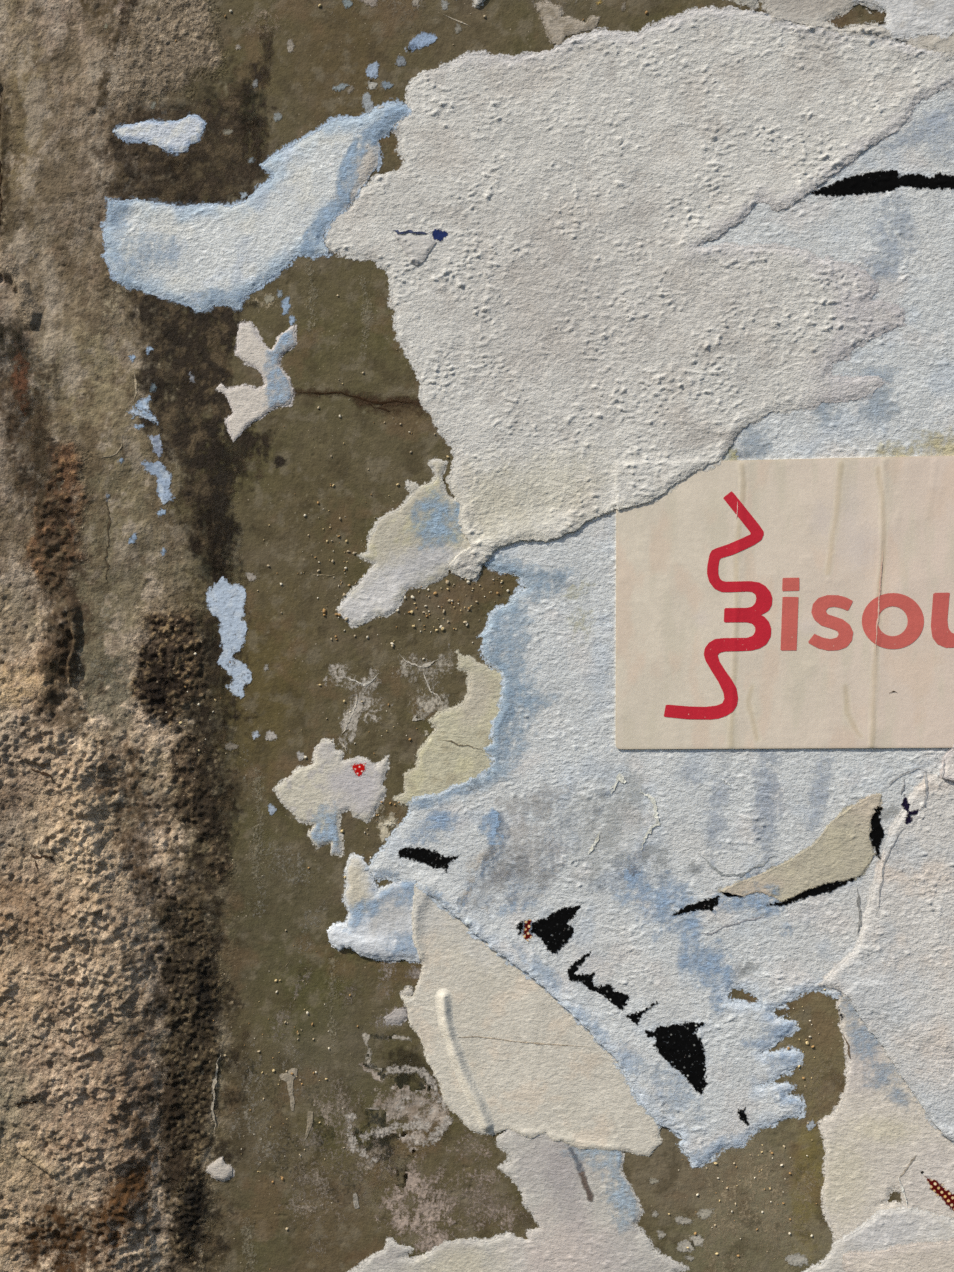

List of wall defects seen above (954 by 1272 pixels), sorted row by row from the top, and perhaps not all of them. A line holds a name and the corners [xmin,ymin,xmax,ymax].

spalling [103,0,232,108]
spalling [123,596,237,1272]
damp [0,284,524,1272]
peeling [345,1063,452,1164]